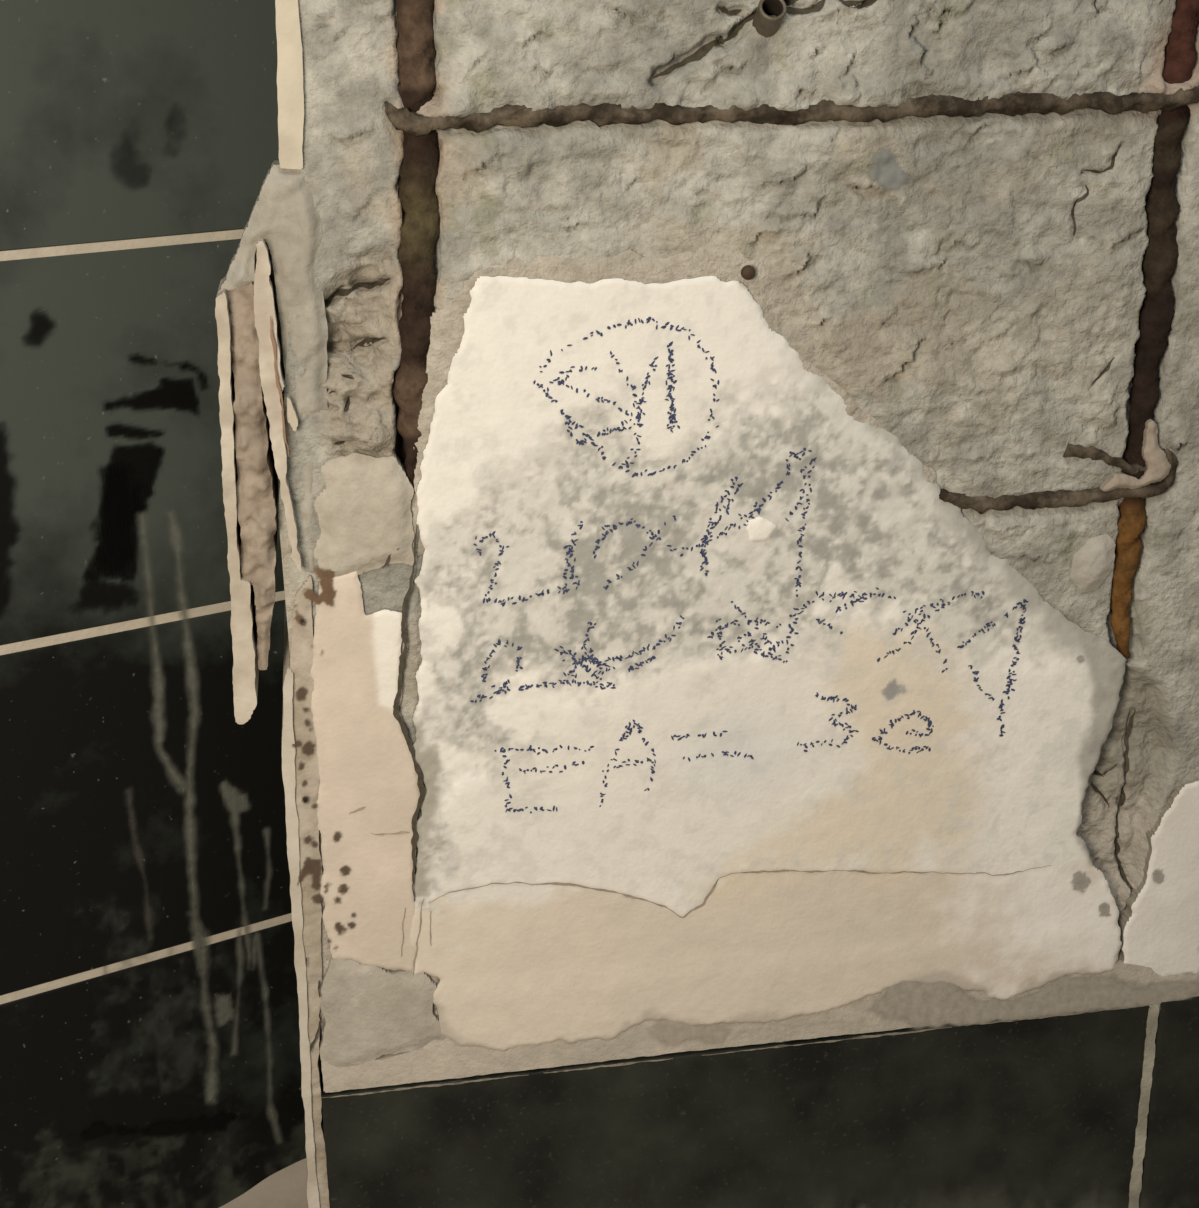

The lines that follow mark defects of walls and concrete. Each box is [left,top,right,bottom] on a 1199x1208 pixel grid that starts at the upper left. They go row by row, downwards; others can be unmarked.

crack [653,0,877,79]
peeling [218,0,1199,1055]
crack [1091,709,1135,910]